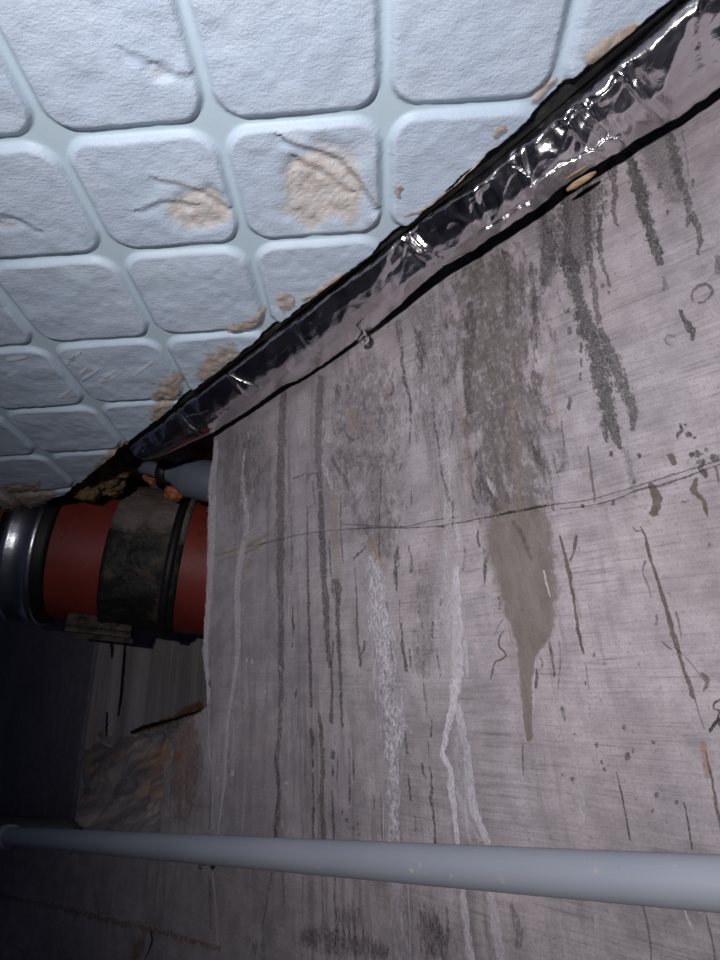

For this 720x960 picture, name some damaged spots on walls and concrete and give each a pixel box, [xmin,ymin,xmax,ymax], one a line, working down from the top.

leakage [662,128,703,255]
leakage [550,152,664,457]
leakage [415,247,584,845]
crack [500,464,720,515]
leakage [353,545,414,842]
spalling [74,715,198,833]
leakage [460,889,475,960]
leakage [487,892,505,960]